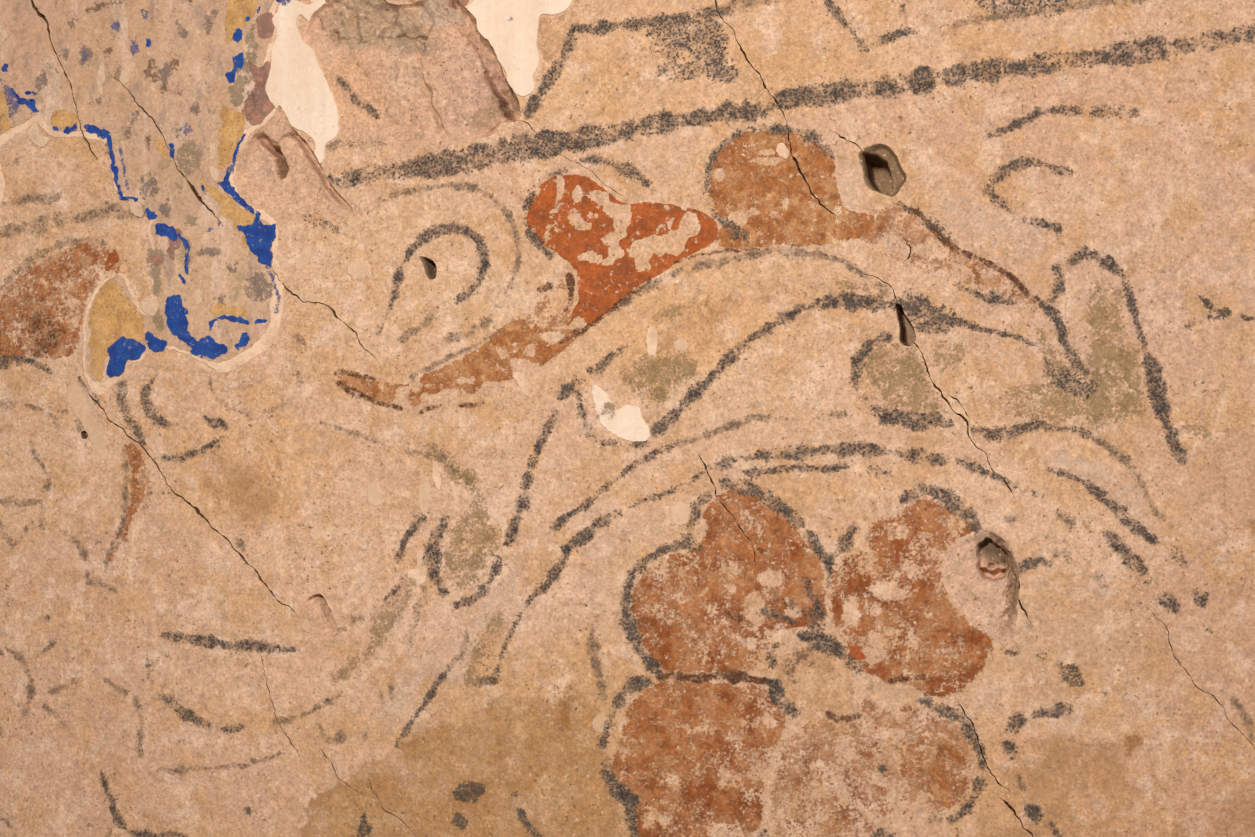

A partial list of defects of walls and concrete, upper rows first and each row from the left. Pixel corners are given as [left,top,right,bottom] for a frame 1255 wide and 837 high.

crack [31,0,98,160]
crack [112,76,219,221]
crack [715,0,841,221]
peeling [0,0,536,460]
crack [850,234,911,302]
peeling [591,384,650,442]
crack [80,380,298,617]
peeling [407,549,428,587]
peeling [417,459,459,515]
peeling [496,516,509,556]
flaking render [943,528,1019,644]
crack [957,698,1034,837]